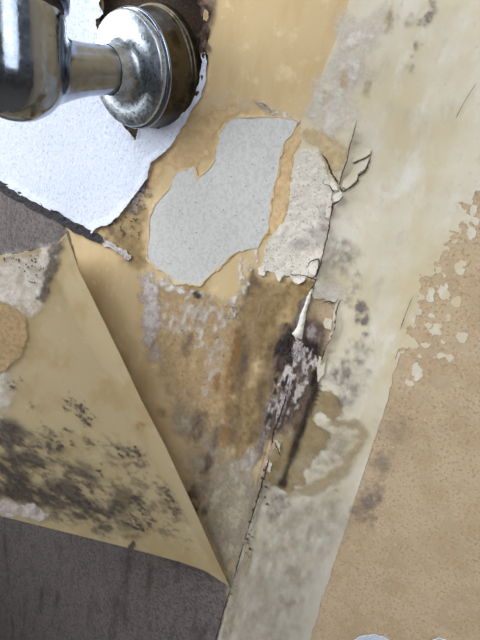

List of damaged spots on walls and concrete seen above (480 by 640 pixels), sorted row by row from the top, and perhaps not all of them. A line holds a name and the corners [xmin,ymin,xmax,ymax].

spalling [96,0,215,96]
peeling [137,21,377,359]
crack [290,119,372,295]
peeling [0,302,28,373]
water stain [355,302,368,325]
water stain [0,421,156,550]
water stain [64,400,93,426]
water stain [151,248,362,600]
crack [215,299,343,640]